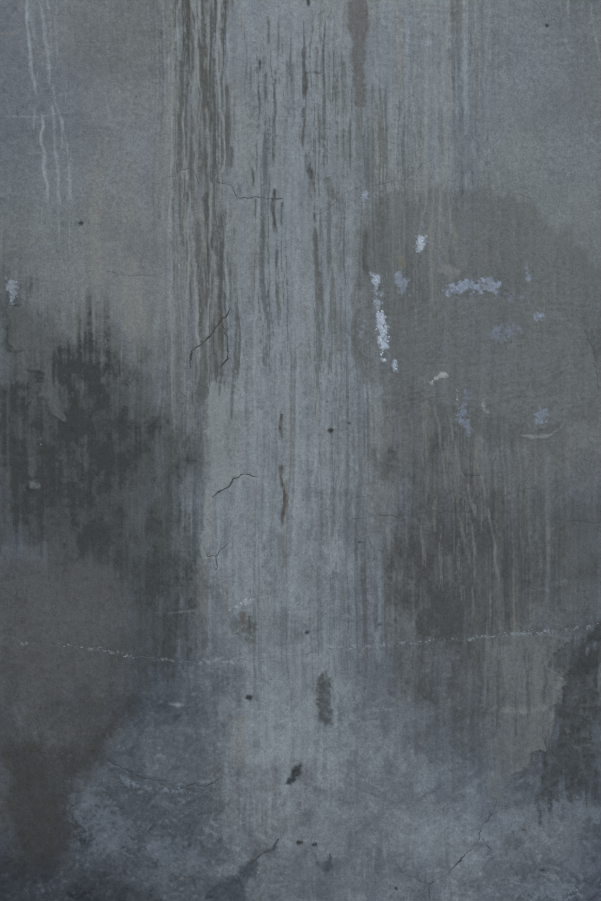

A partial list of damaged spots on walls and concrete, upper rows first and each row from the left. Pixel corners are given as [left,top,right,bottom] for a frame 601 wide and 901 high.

water stain [191,0,219,160]
water stain [216,0,224,85]
water stain [171,97,193,318]
water stain [194,30,231,373]
crack [189,308,230,368]
water stain [324,219,345,373]
crack [398,800,497,898]